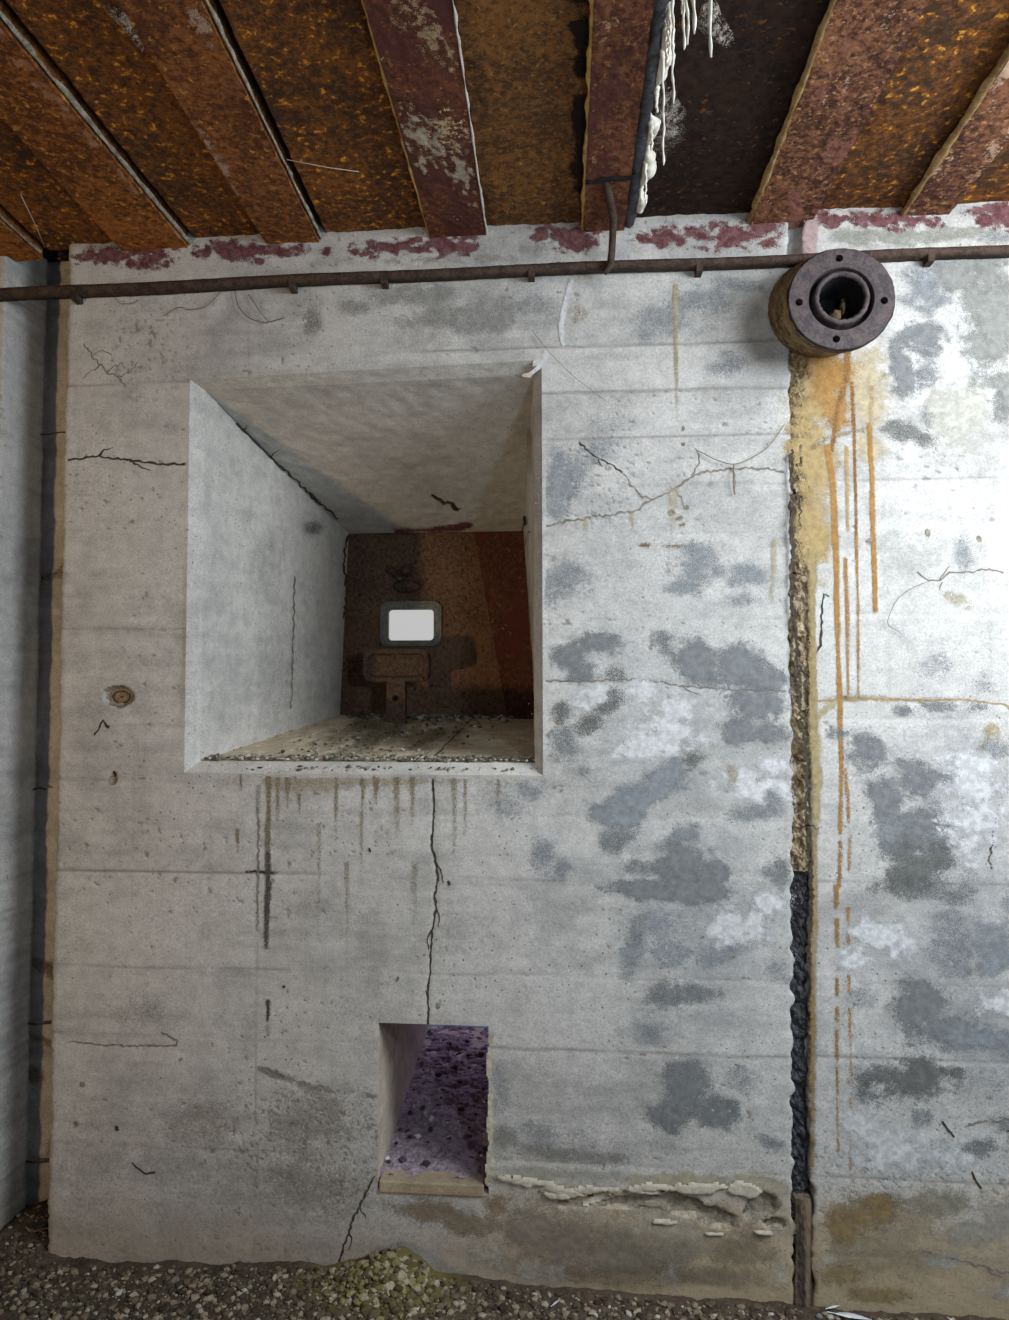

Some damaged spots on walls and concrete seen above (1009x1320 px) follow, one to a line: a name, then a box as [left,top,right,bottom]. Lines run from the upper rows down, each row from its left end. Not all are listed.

efflorescence [656,9,676,87]
peeling [56,235,480,271]
peeling [529,222,607,262]
efflorescence [636,113,661,214]
peeling [629,201,1009,256]
damp [616,274,773,431]
crack [68,447,186,471]
crack [522,442,1009,971]
corrosion [768,333,965,1171]
crack [426,718,473,1024]
damp [161,404,1009,1307]
spalling [385,1032,803,1244]